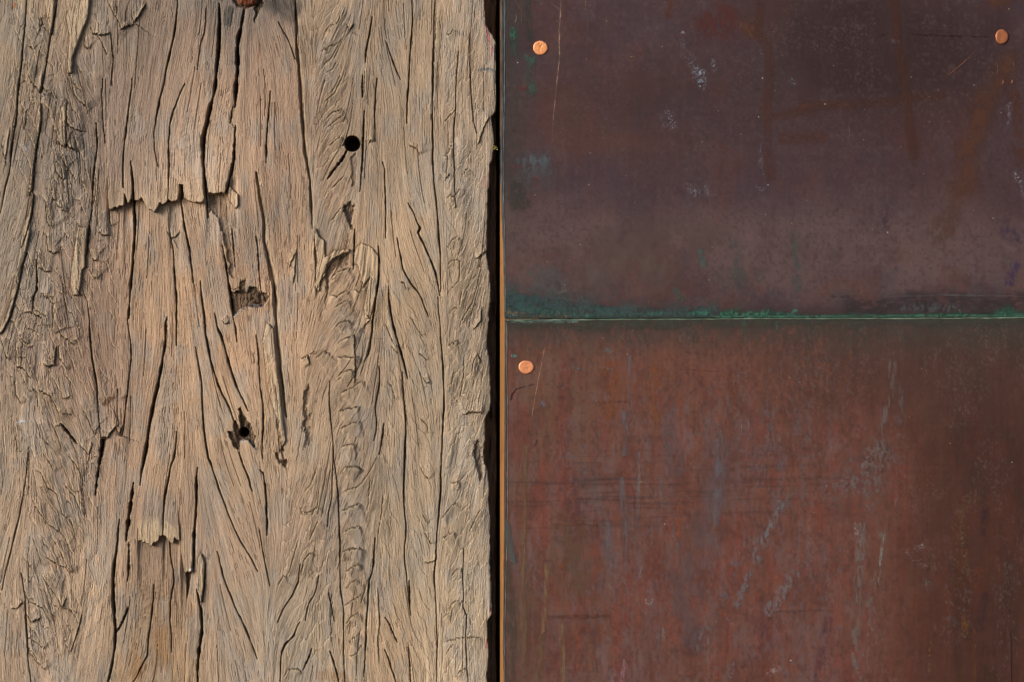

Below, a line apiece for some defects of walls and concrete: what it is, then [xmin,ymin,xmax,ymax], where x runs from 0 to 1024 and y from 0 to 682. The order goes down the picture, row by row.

crack [0,0,58,334]
crack [61,0,477,682]
leakage [504,291,1024,329]
crack [2,453,31,679]